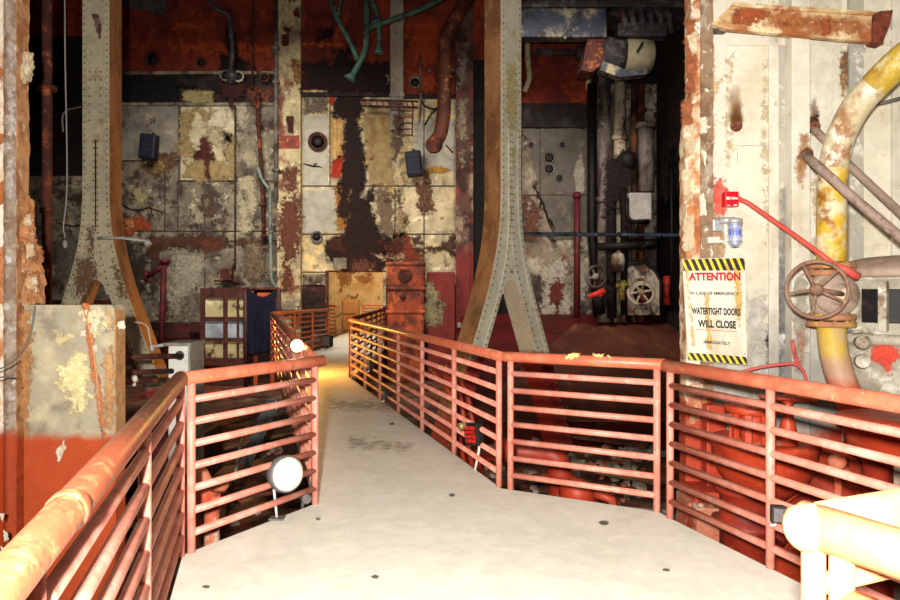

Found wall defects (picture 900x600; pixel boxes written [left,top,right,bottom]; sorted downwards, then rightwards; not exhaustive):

peeling [5,89,17,140]
peeling [6,157,82,307]
peeling [141,87,258,235]
rust [123,164,306,293]
rust [286,116,294,133]
rust [325,90,456,299]
rust [522,193,542,243]
rust [681,20,698,138]
rust [731,4,862,36]
peeling [53,306,125,414]
rust [71,226,131,440]
rust [548,277,565,314]